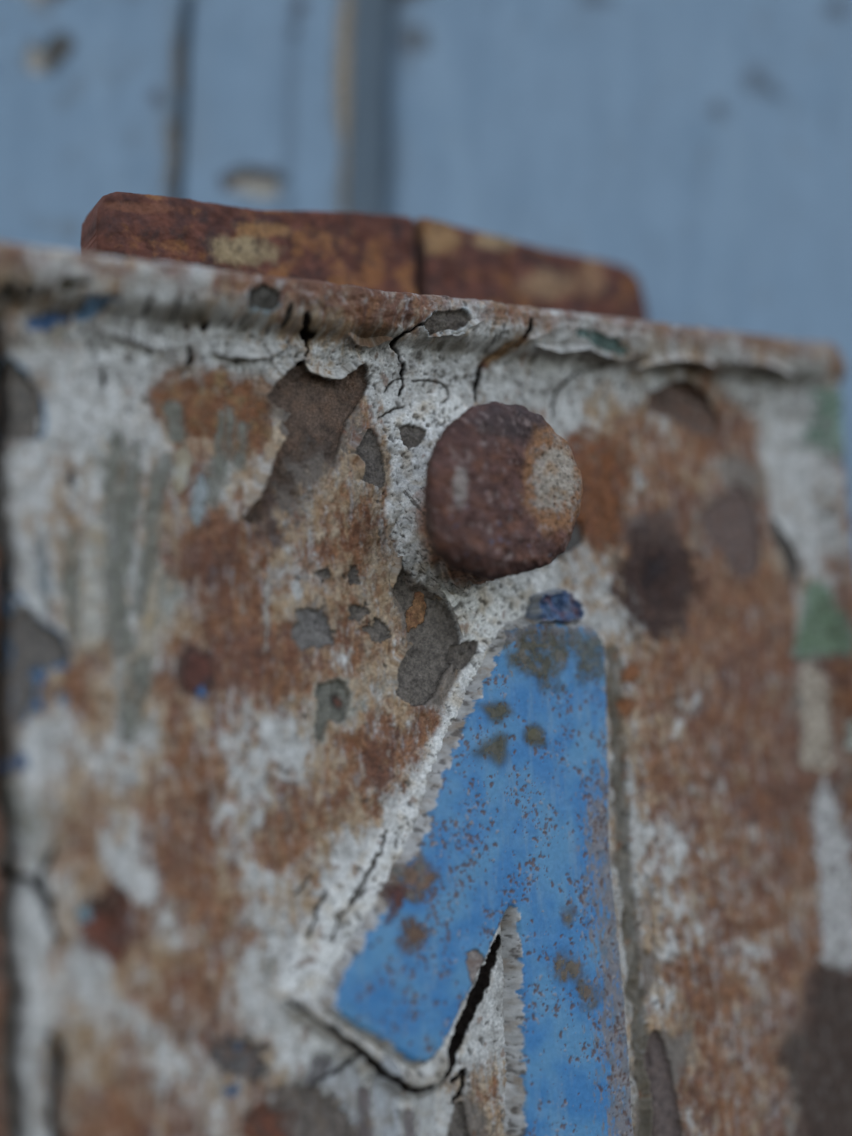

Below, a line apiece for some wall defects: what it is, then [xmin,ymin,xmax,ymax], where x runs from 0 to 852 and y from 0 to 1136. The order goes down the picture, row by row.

crack [184,346,193,366]
corrosion [148,357,270,460]
peeling [213,332,393,524]
crack [297,311,316,366]
crack [377,318,533,419]
peeling [527,326,722,438]
corrosion [566,425,710,642]
corrosion [183,646,215,697]
peeling [348,602,391,644]
peeling [388,551,478,706]
crack [285,934,501,1105]
corrosion [555,955,597,1007]